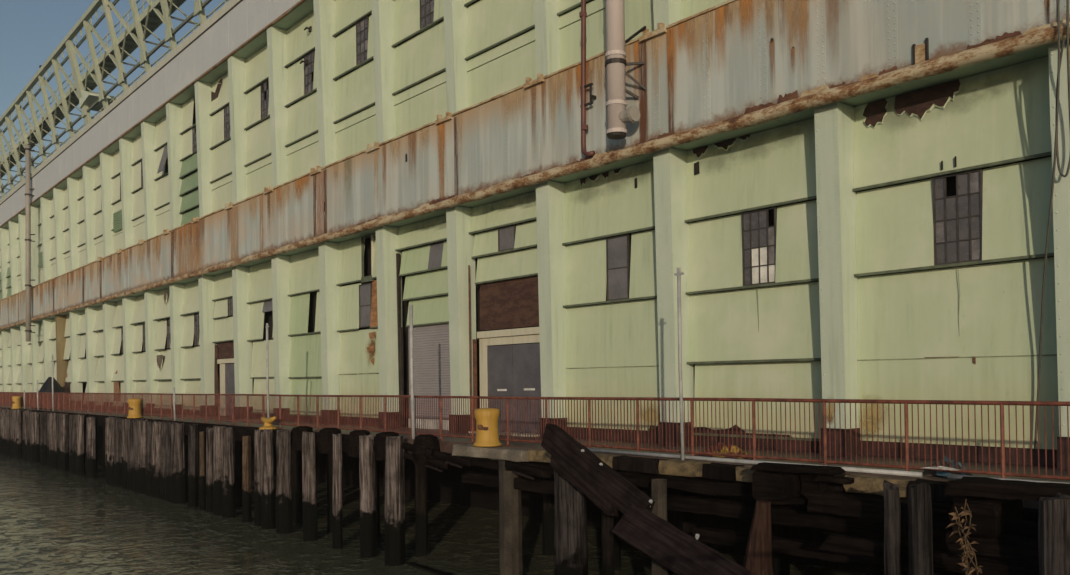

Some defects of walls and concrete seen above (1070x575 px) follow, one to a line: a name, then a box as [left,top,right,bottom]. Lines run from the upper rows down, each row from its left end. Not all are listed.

corrosion [504,57,606,125]
corrosion [625,0,752,142]
peeling [862,79,961,128]
corrosion [410,113,462,198]
peeling [693,134,750,159]
corrosion [228,159,350,259]
corrosion [0,218,204,321]
peeling [367,331,376,365]